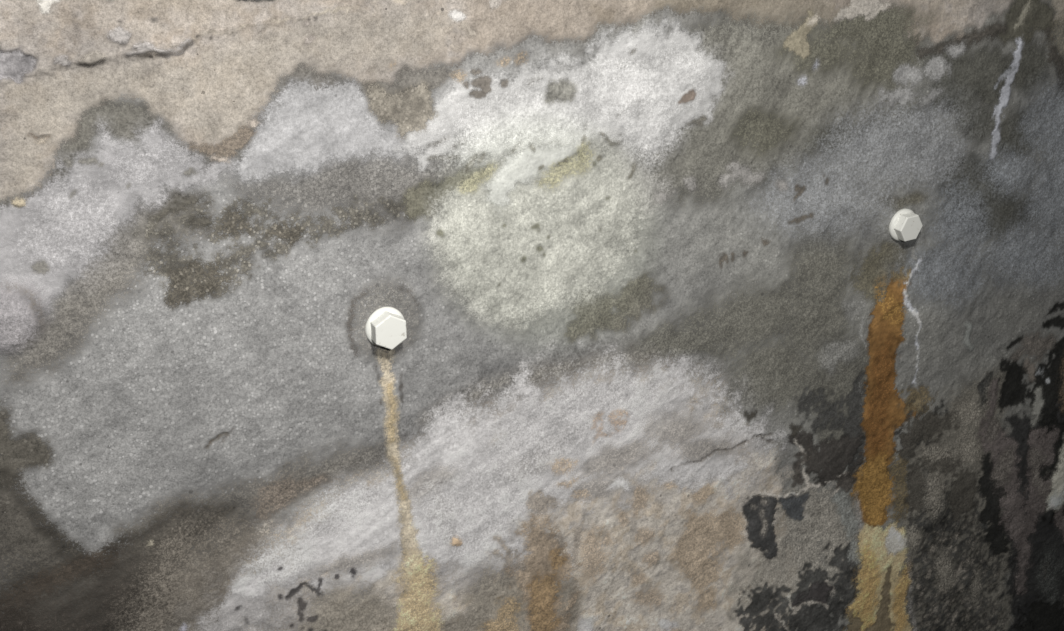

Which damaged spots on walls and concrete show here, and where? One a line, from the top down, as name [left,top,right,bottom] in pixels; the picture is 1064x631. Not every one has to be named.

rust [843,266,931,631]
rust [376,349,443,631]
water stain [555,552,598,631]
water stain [927,549,955,591]
water stain [950,589,969,612]
water stain [971,572,980,601]